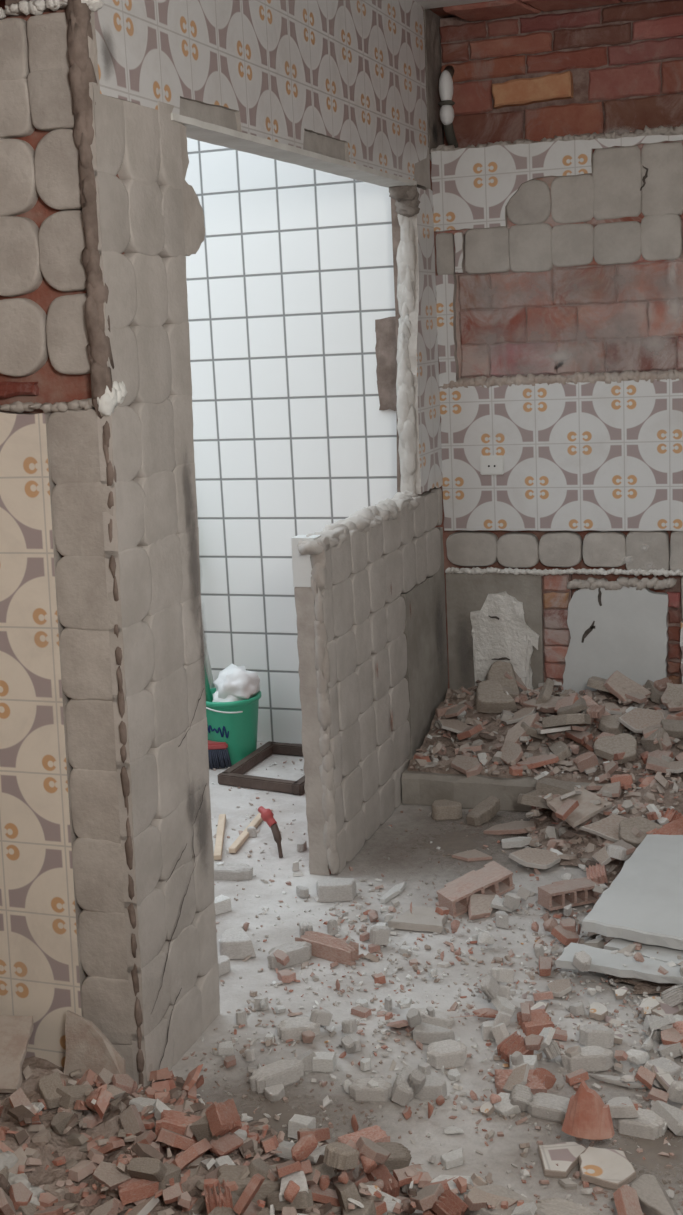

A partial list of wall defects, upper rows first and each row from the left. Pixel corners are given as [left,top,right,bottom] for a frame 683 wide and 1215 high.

peeling [0,0,238,1087]
flaking render [297,0,683,875]